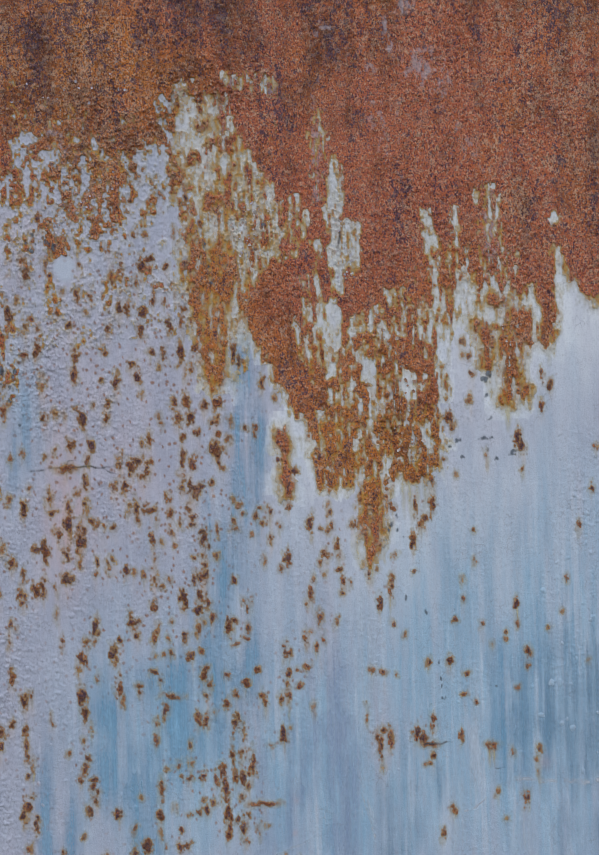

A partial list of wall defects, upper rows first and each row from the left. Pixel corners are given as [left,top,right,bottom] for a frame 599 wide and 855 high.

peeling [24,171,122,253]
corrosion [0,0,599,662]
corrosion [76,618,101,675]
corrosion [108,636,125,708]
corrosion [279,645,310,706]
corrosion [77,689,92,729]
corrosion [0,720,35,778]
corrosion [130,666,278,855]
corrosion [376,724,395,769]
corrosion [411,714,437,766]
corrosion [19,796,40,833]